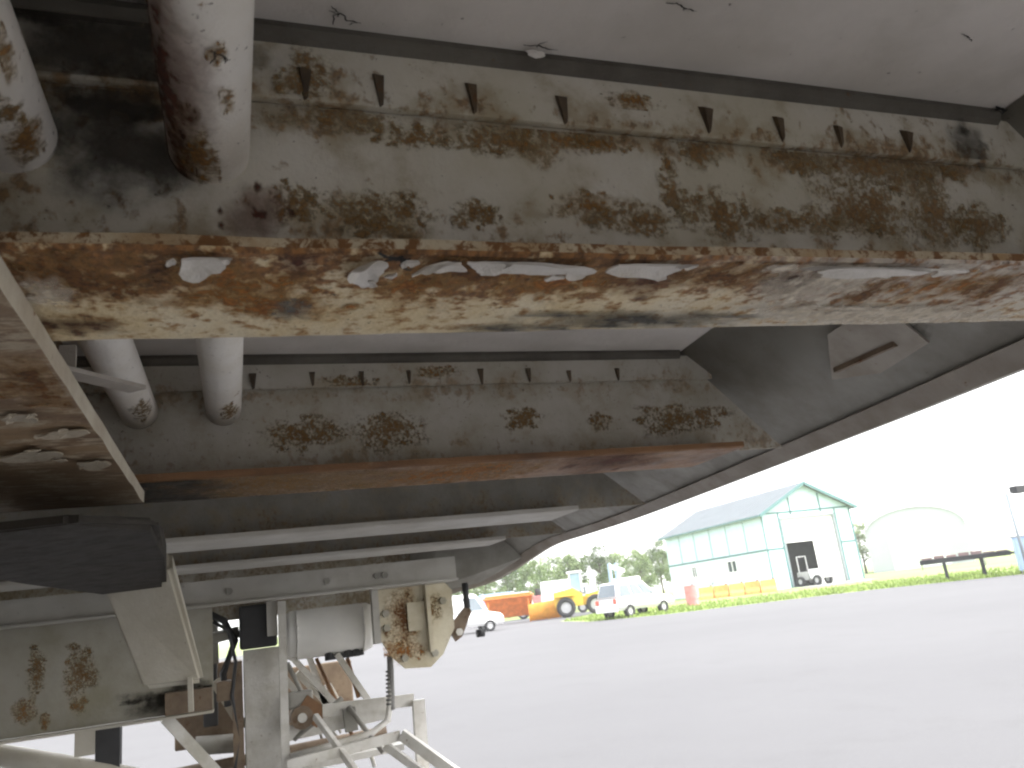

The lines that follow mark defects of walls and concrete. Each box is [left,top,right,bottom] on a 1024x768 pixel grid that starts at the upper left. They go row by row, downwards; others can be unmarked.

corrosion [0,99,45,165]
corrosion [147,0,222,183]
corrosion [268,48,633,168]
corrosion [239,178,432,238]
corrosion [549,141,1012,251]
corrosion [9,250,321,319]
corrosion [375,257,608,307]
peeling [347,260,699,288]
corrosion [624,262,821,301]
corrosion [844,269,1024,303]
peeling [0,413,111,471]
corrosion [383,589,442,660]